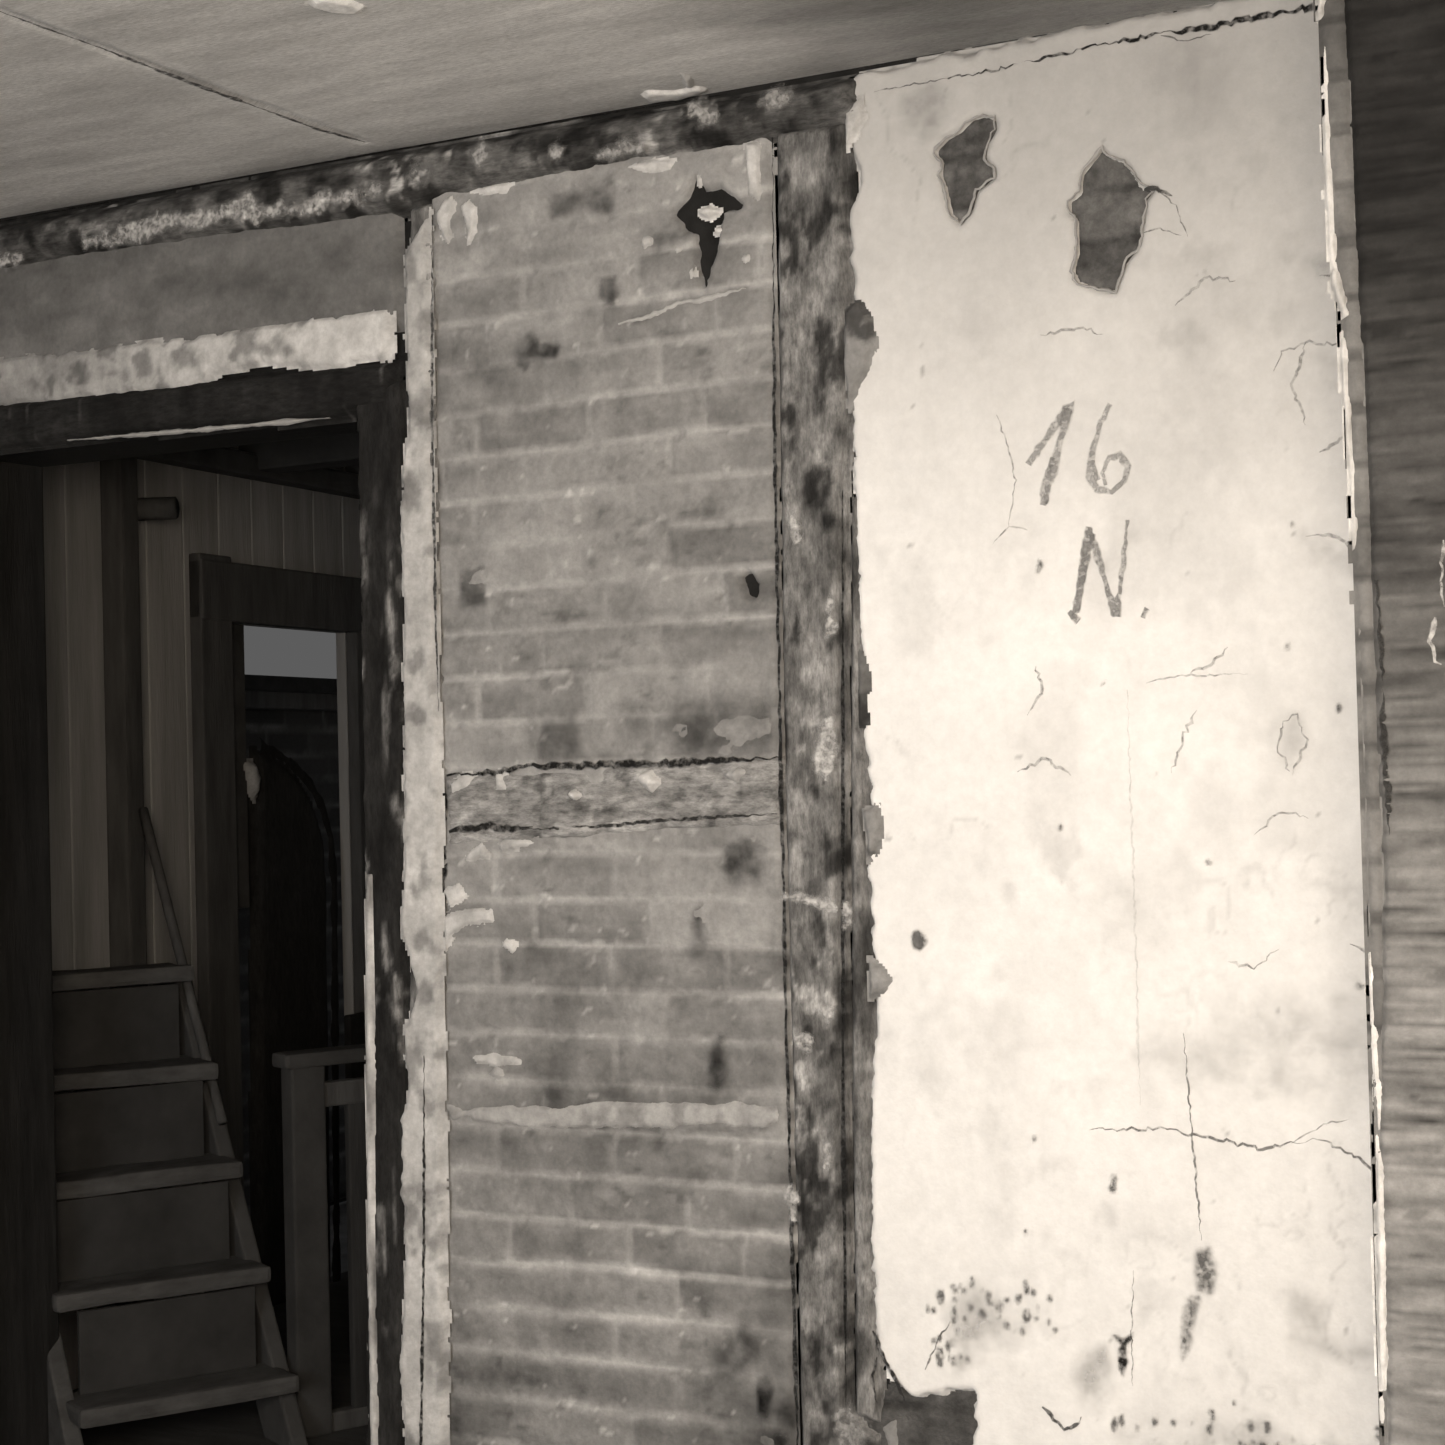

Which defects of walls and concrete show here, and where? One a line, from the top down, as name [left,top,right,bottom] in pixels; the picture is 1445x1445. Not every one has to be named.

peeling [549,146,563,159]
peeling [597,141,643,158]
spalling [933,114,997,225]
peeling [83,185,381,248]
spalling [698,203,723,238]
spalling [1066,145,1186,294]
crack [446,756,781,776]
crack [449,813,777,833]
crack [1092,1033,1371,1240]
leakage [758,1389,771,1413]
leakage [772,1413,792,1445]
spalling [864,1381,978,1445]